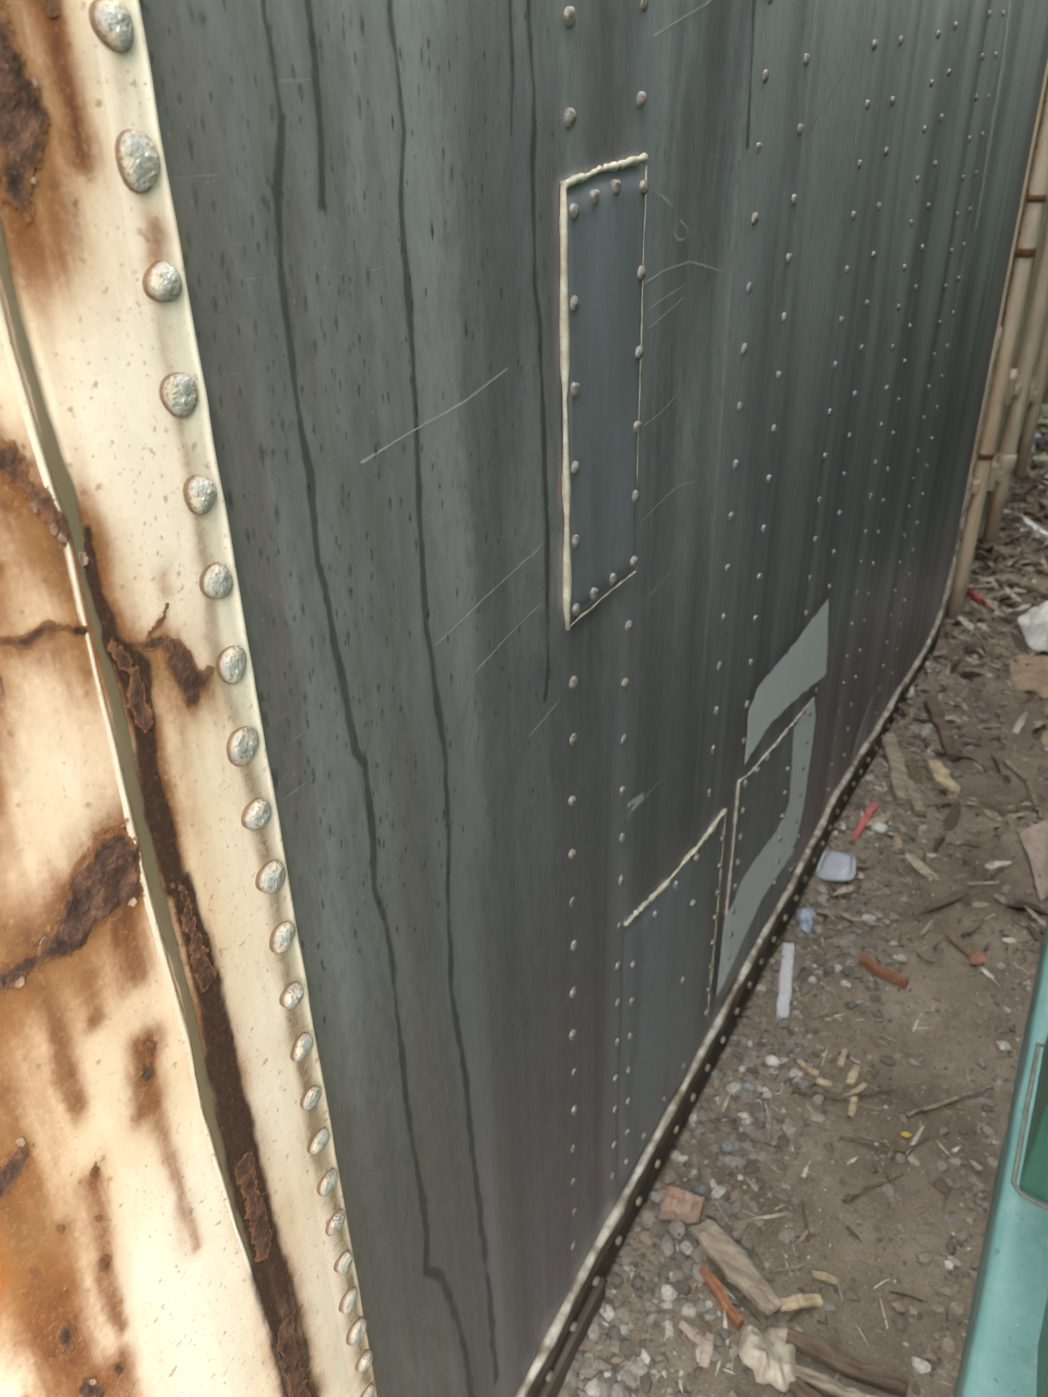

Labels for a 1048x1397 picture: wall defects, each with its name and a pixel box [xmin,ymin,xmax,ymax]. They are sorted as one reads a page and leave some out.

corrosion [0,0,94,269]
corrosion [0,432,323,1397]
corrosion [330,1188,374,1397]